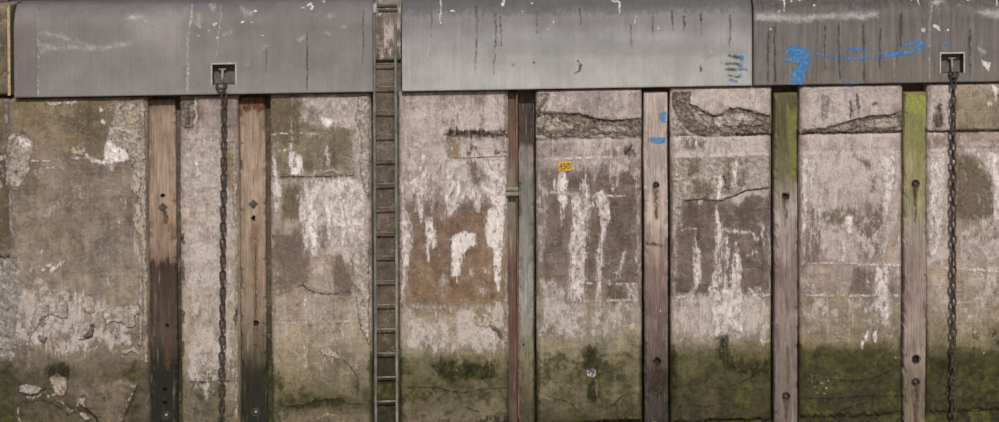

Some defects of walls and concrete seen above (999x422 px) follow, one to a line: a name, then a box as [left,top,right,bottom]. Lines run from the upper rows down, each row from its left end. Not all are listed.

spalling [536,93,642,137]
spalling [672,91,771,137]
spalling [802,112,902,135]
water stain [399,95,508,332]
water stain [537,149,642,339]
water stain [660,207,771,349]
water stain [932,243,999,305]
flaking render [19,362,99,422]
water stain [587,351,600,402]